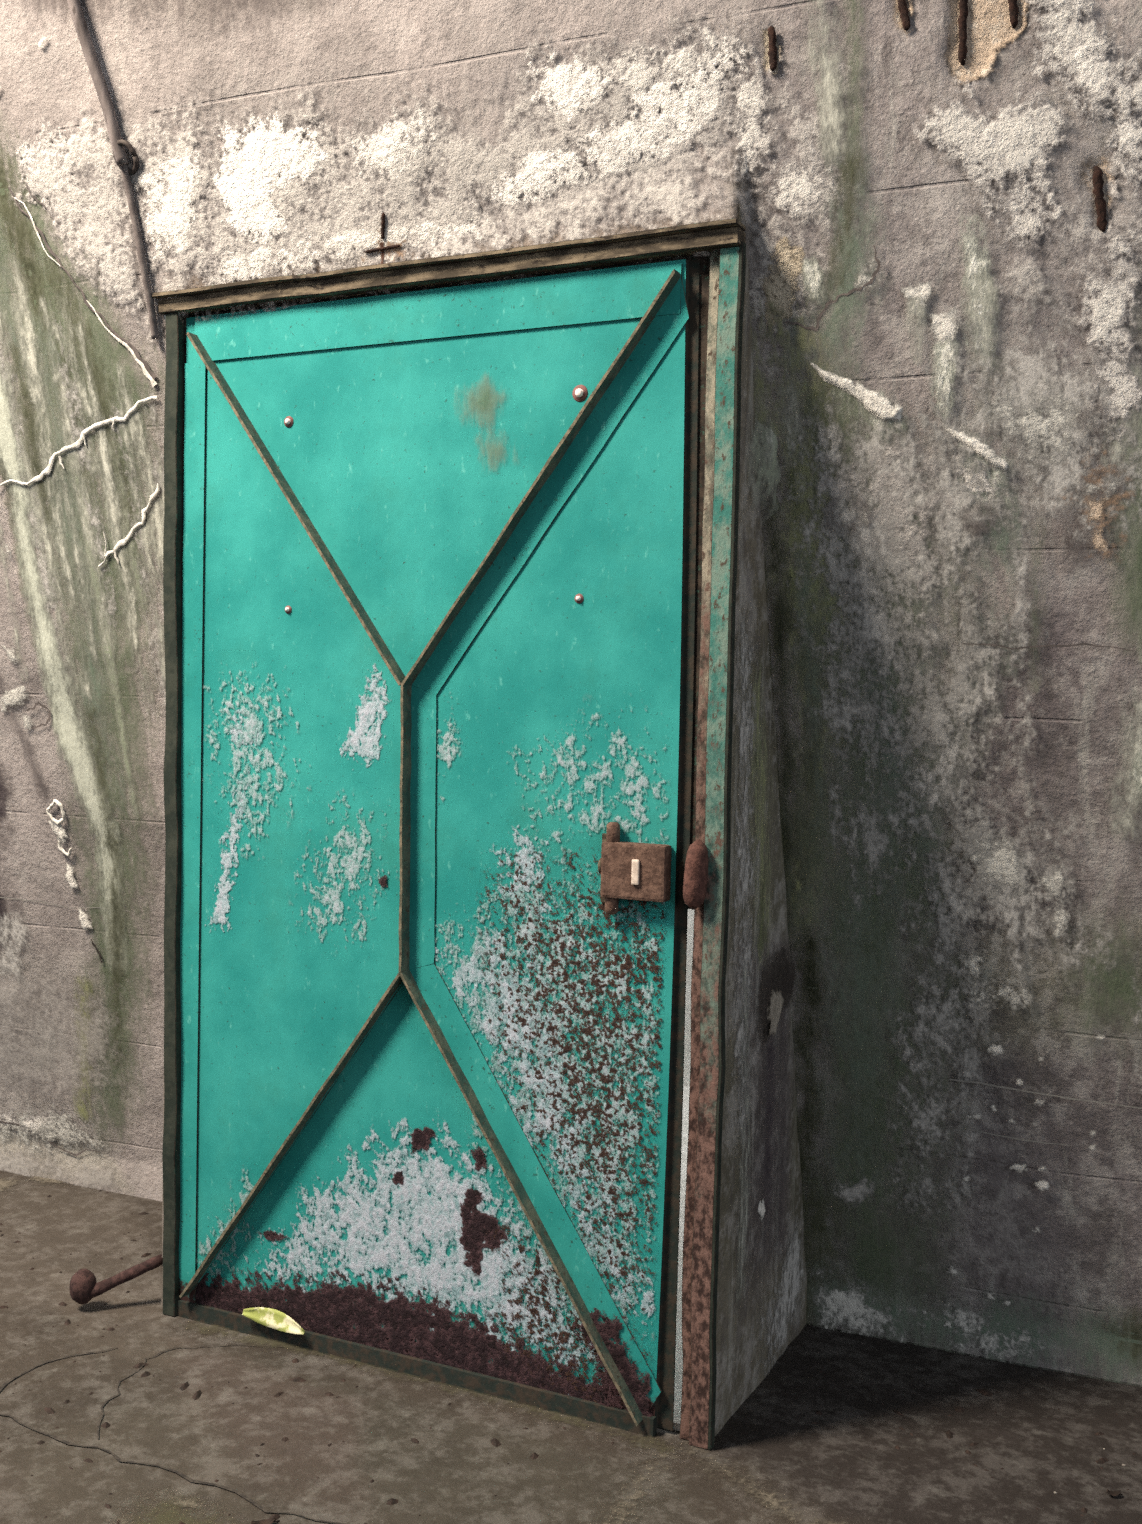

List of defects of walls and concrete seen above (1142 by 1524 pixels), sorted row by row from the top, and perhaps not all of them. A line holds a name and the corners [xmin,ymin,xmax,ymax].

damp [803,0,861,299]
peeling [912,0,1142,362]
crack [0,183,157,487]
damp [0,160,166,1029]
crack [98,483,160,567]
damp [732,259,1142,1366]
damp [0,978,120,1154]